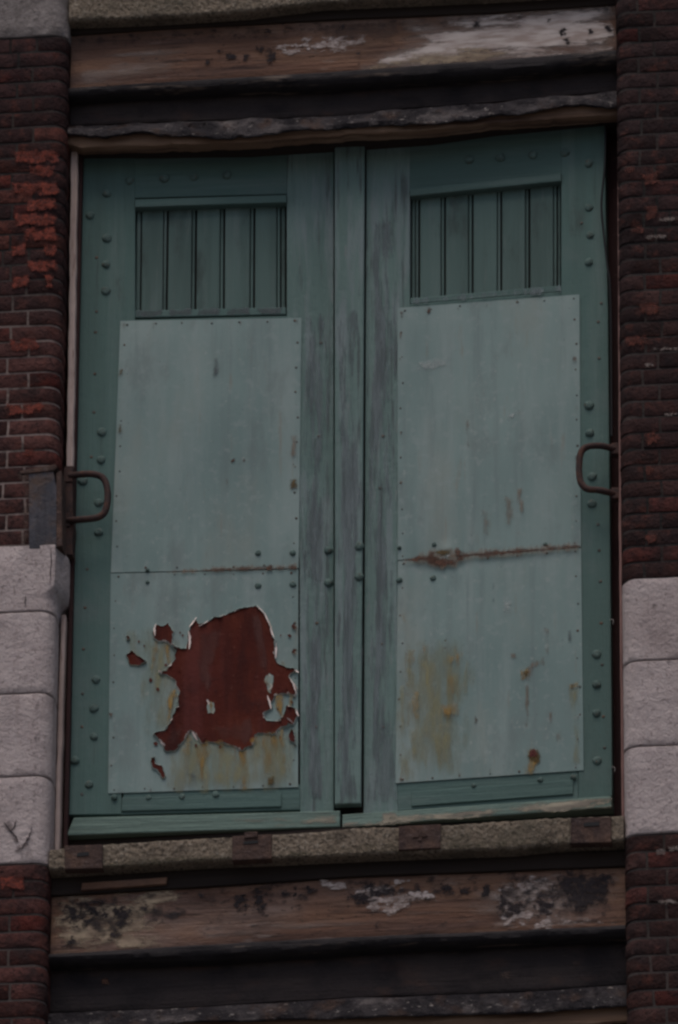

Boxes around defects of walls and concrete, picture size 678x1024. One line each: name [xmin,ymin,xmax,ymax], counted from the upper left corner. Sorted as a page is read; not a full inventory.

peeling [368,7,614,69]
rust [405,544,580,568]
peeling [126,605,299,780]
damp [347,869,614,918]
damp [58,894,185,947]